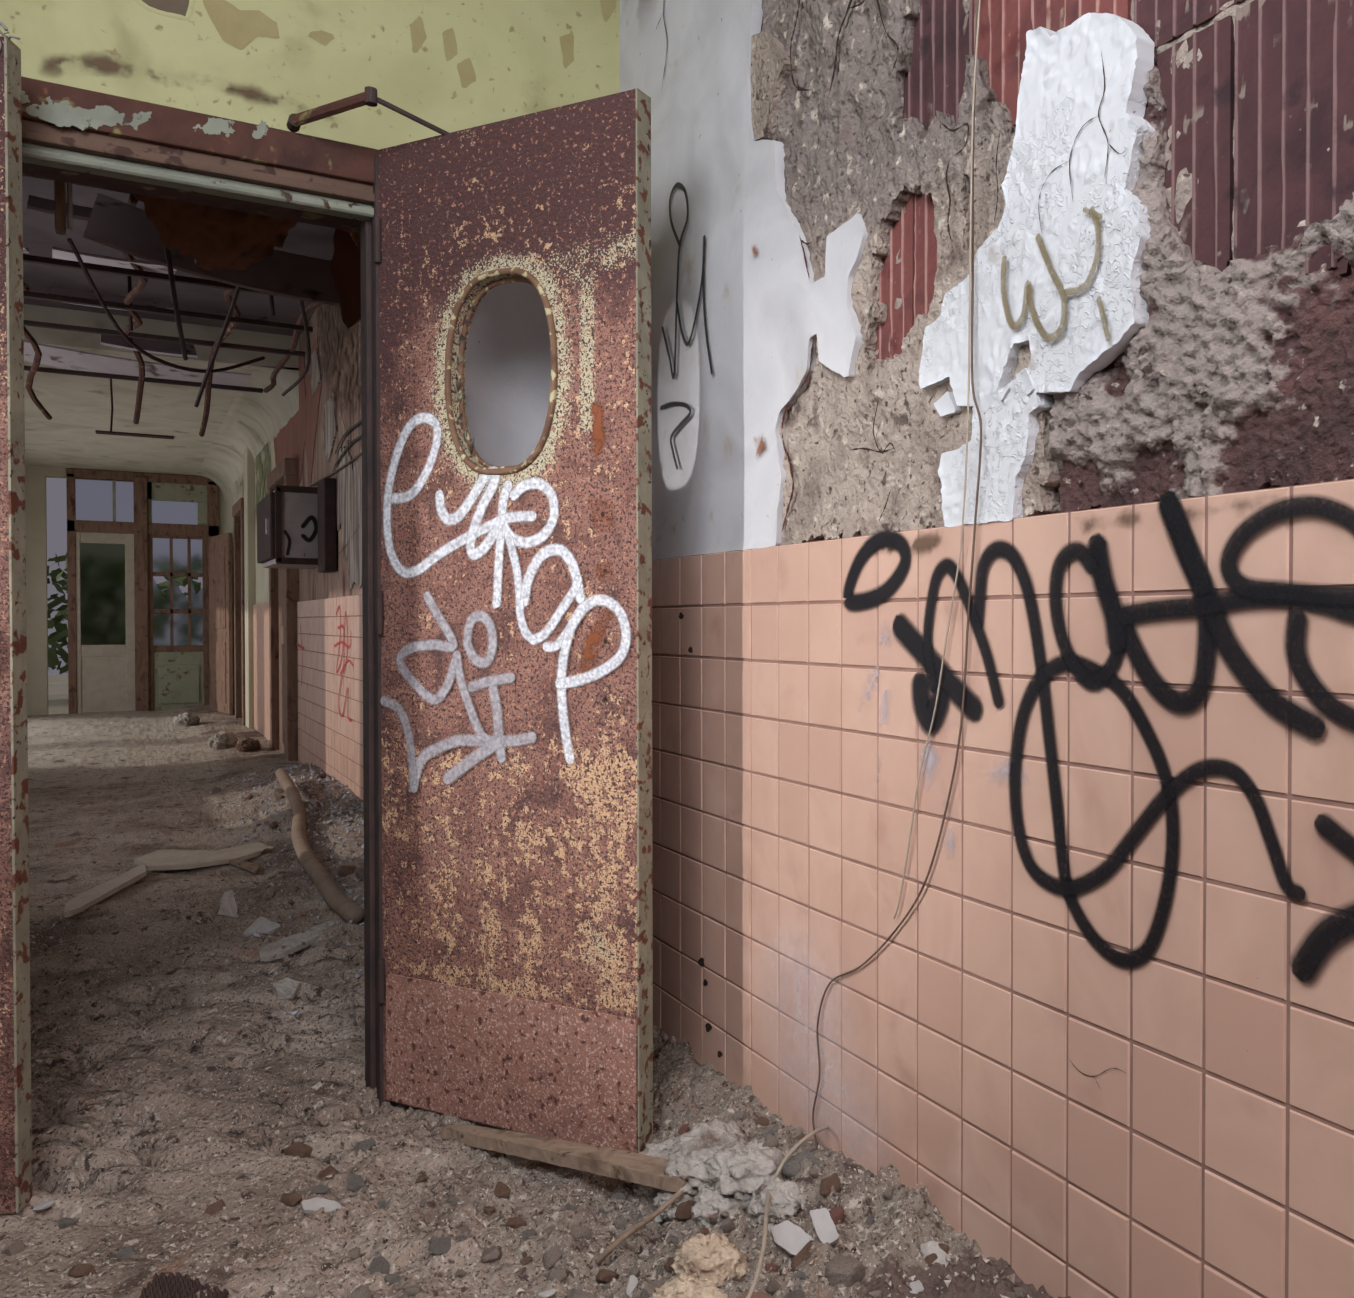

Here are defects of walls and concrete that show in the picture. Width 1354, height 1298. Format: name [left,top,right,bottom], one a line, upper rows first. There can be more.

peeling [134,0,280,50]
peeling [308,31,335,46]
peeling [410,16,476,88]
peeling [560,33,574,69]
spalling [750,0,1354,545]
peeling [274,337,362,590]